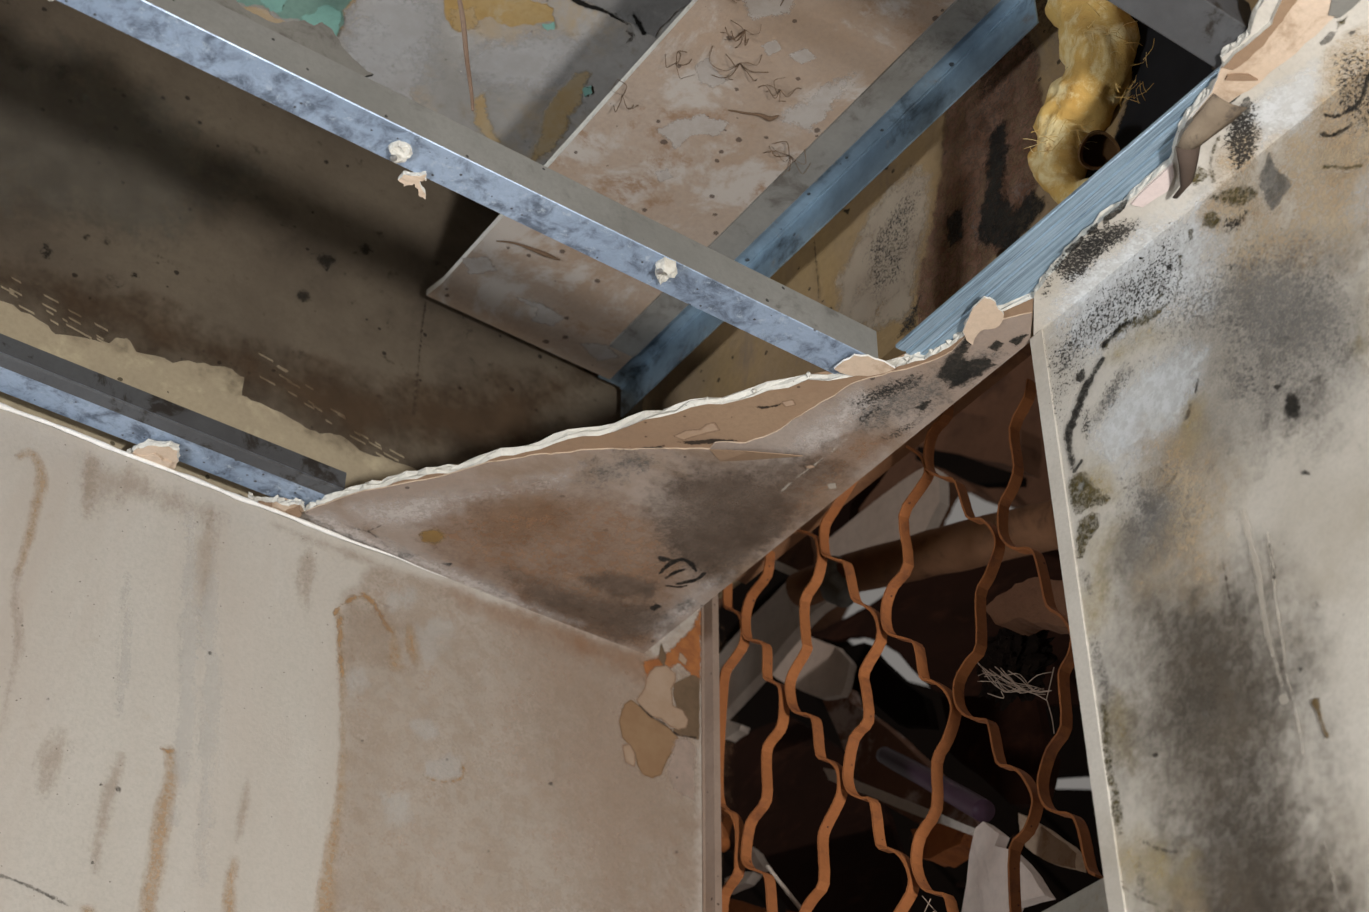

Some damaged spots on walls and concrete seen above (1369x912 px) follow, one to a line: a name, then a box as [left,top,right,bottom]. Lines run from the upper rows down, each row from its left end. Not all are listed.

peeling [236,0,356,36]
peeling [444,0,555,32]
crack [572,0,646,43]
peeling [0,276,418,489]
spalling [643,422,736,448]
peeling [174,461,270,498]
peeling [299,512,336,530]
leakage [333,593,417,686]
leakage [1092,379,1326,912]
peeling [619,665,700,799]
leakage [1312,698,1329,738]
leakage [144,748,177,912]